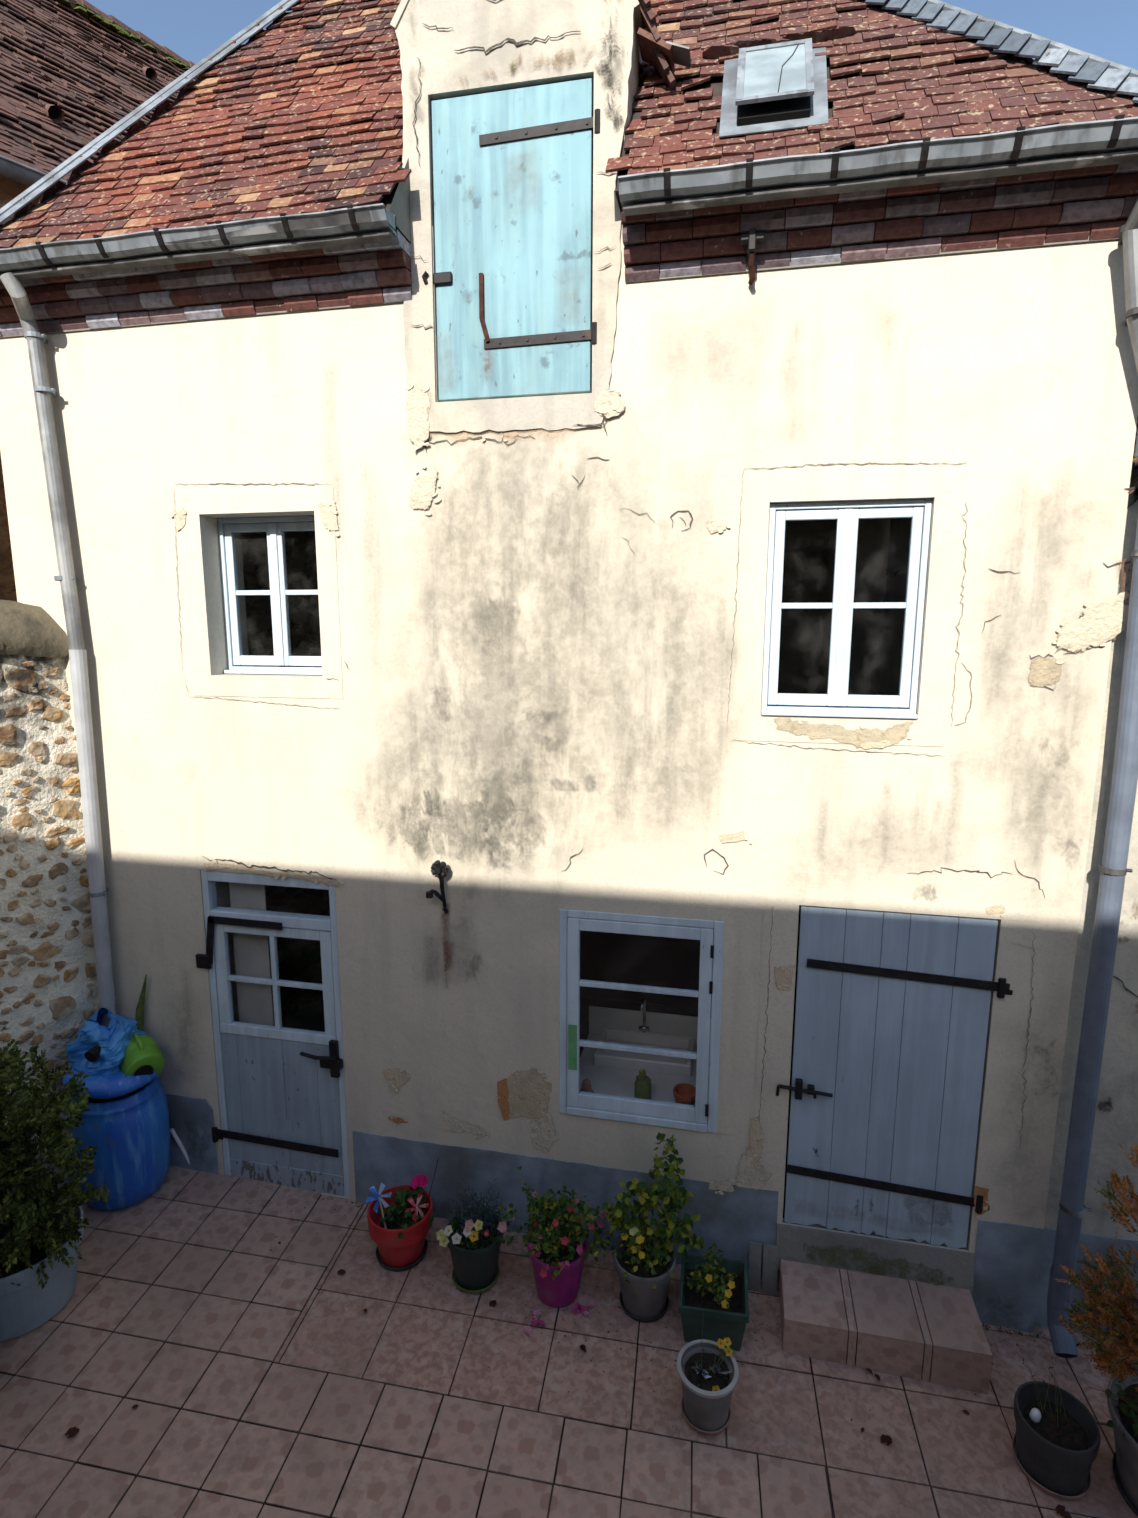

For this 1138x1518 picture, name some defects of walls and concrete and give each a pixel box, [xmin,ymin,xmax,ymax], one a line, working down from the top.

flaking render [406,385,430,452]
flaking render [594,389,625,418]
peeling [1028,657,1061,687]
flaking render [774,717,913,751]
flaking render [204,857,344,887]
flaking render [495,1068,552,1123]
flaking render [709,1116,771,1195]